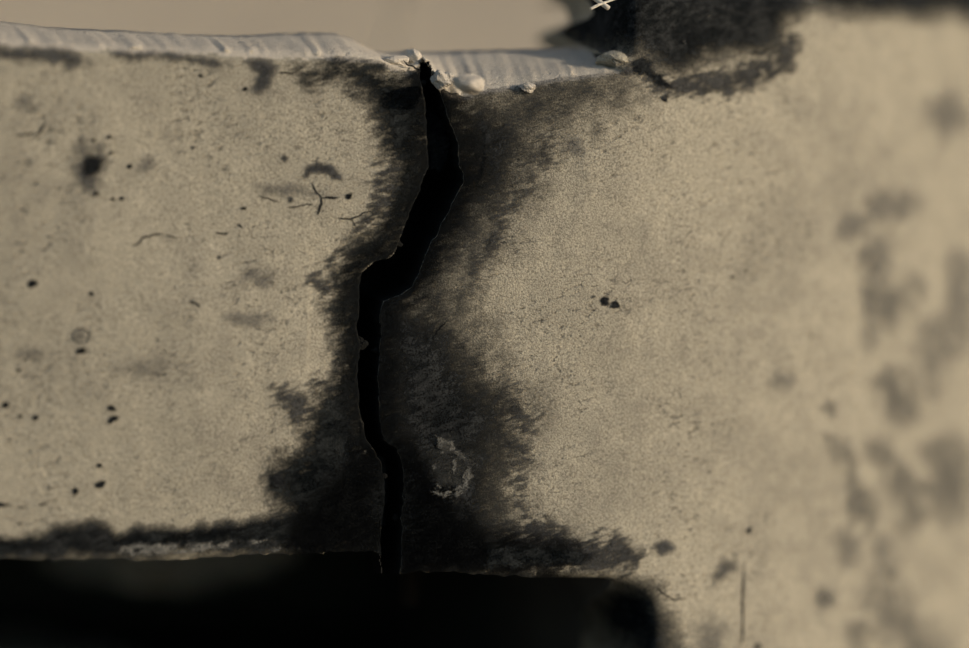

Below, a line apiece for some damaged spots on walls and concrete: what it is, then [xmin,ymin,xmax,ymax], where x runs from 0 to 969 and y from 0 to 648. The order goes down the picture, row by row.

leakage [0,44,92,69]
leakage [115,49,222,68]
leakage [558,0,969,79]
leakage [119,56,434,556]
crack [357,60,484,575]
leakage [377,72,635,577]
leakage [0,538,35,554]
leakage [583,575,683,648]
crack [739,562,747,646]